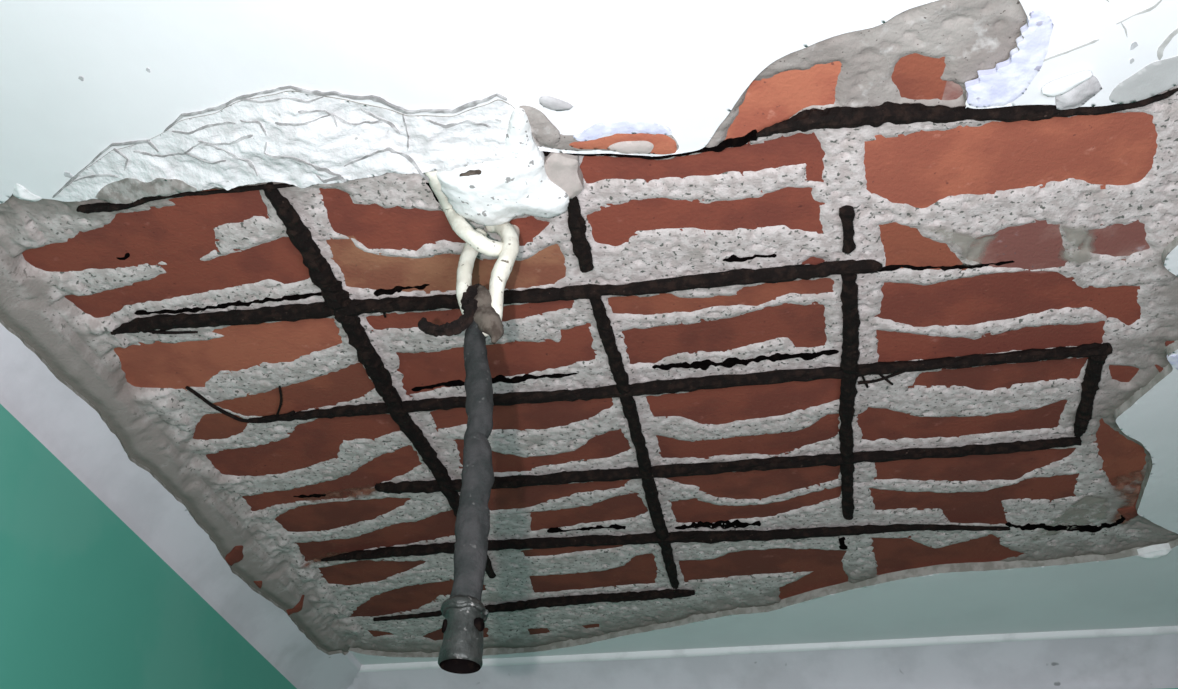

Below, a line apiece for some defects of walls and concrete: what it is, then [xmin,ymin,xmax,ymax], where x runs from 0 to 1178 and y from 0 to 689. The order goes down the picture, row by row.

crack [1043,0,1162,62]
crack [1157,28,1178,60]
spalling [465,219,502,241]
spalling [472,252,498,290]
rust [473,285,504,344]
spalling [481,0,1178,649]
spalling [0,172,468,653]